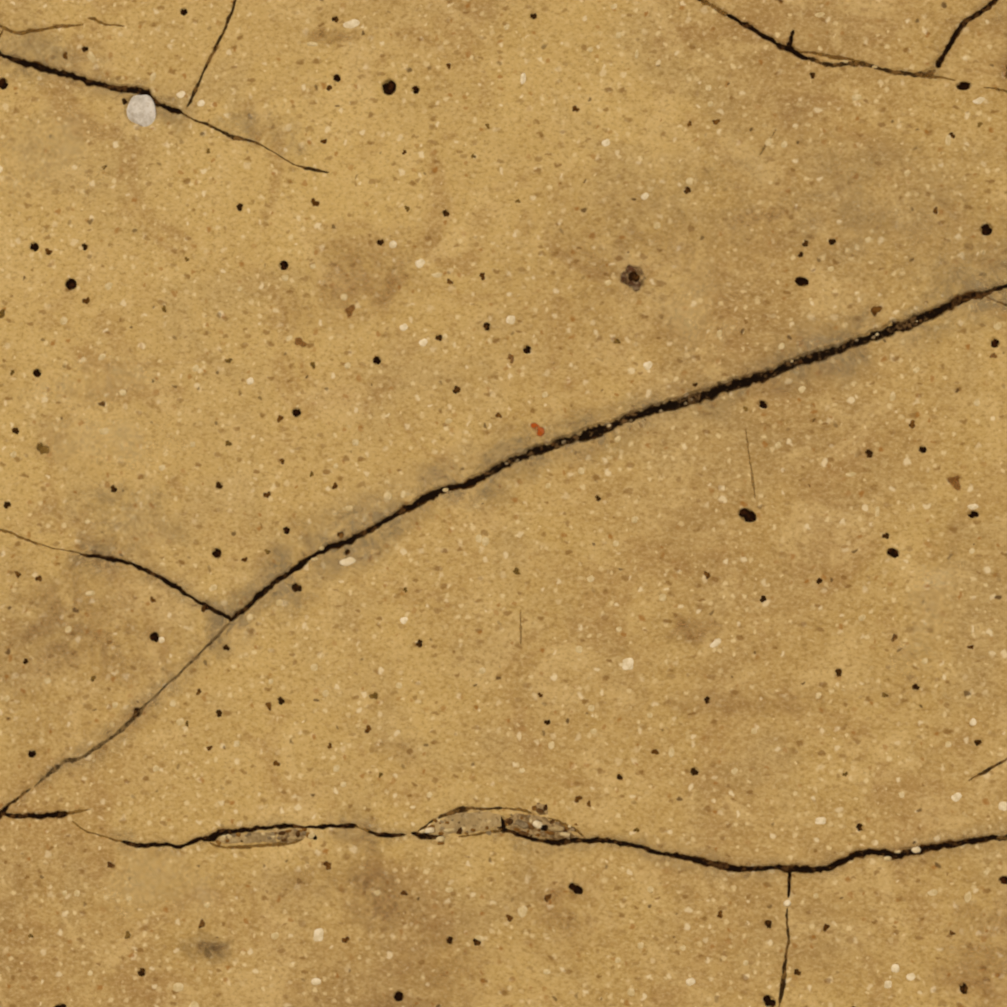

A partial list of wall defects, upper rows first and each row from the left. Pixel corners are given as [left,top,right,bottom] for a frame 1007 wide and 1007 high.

crack [0,0,329,173]
crack [698,0,998,81]
crack [0,284,1007,1006]